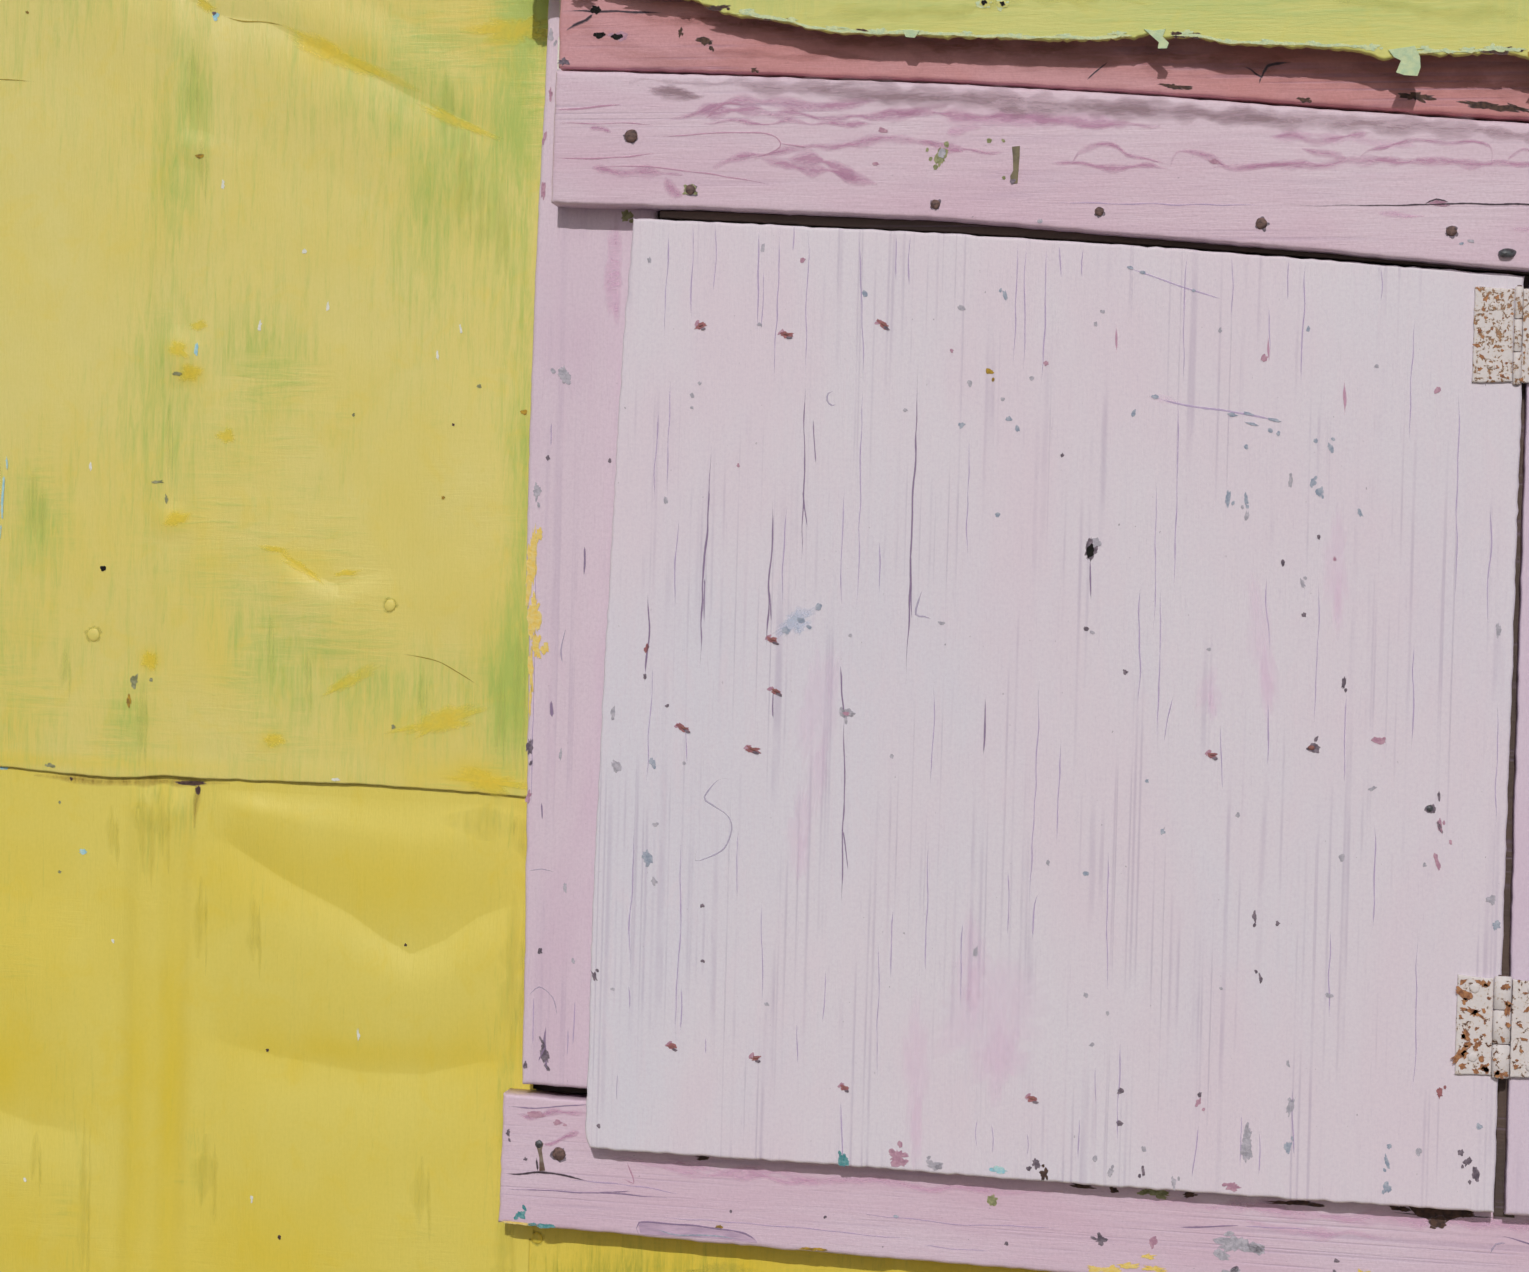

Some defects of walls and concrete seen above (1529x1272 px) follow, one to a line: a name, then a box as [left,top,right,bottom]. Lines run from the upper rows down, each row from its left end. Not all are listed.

peeling [975,0,1009,11]
peeling [548,0,570,69]
peeling [593,31,628,42]
peeling [678,27,714,51]
peeling [1457,100,1529,112]
corrosion [1472,287,1527,382]
corrosion [1451,979,1529,1079]